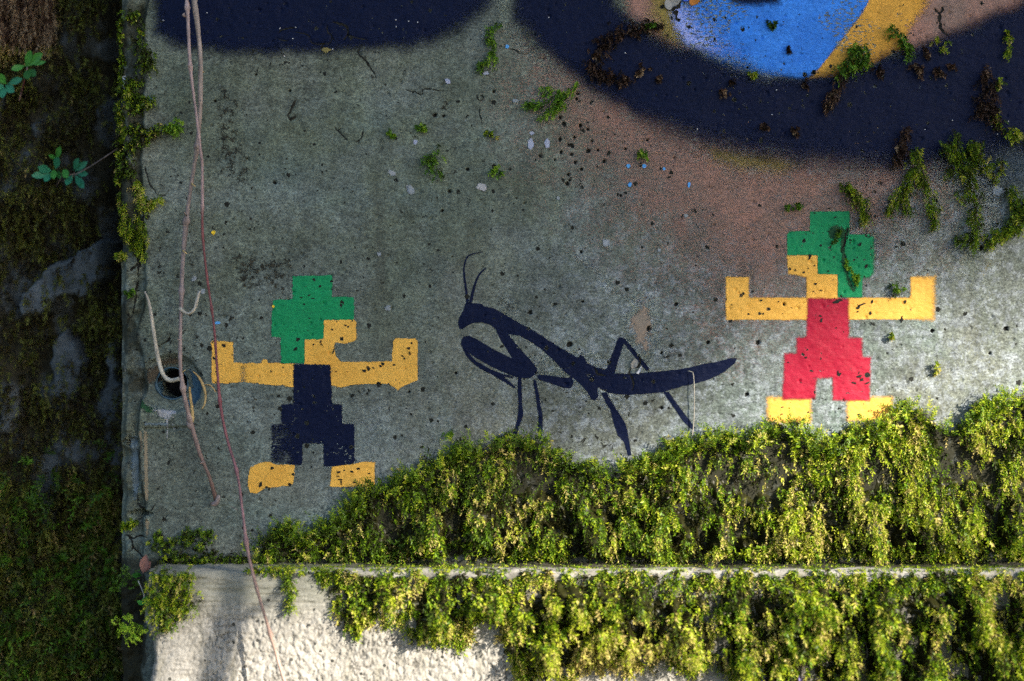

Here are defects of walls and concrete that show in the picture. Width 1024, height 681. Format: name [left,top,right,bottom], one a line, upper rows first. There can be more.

crack [934,7,949,36]